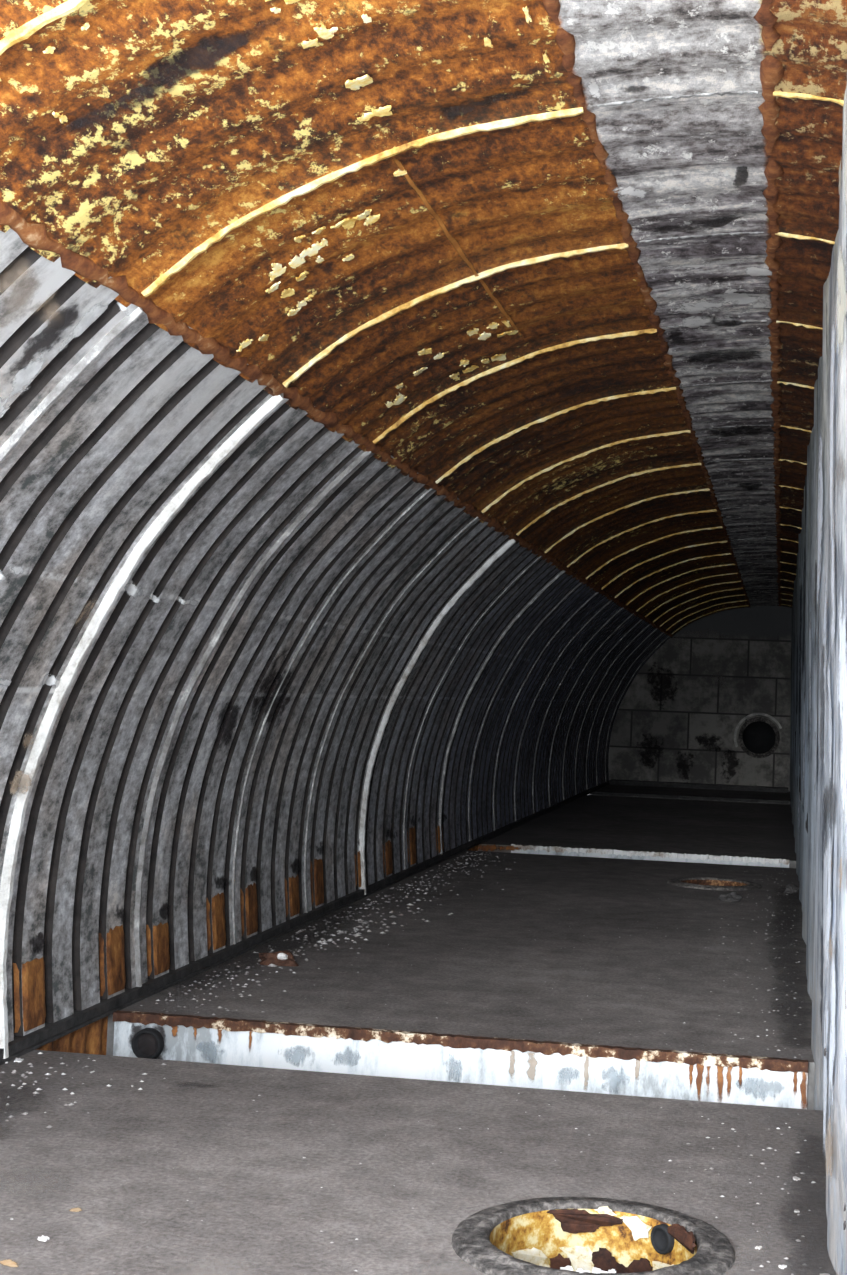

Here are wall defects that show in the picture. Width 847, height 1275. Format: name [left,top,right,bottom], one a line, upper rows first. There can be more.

peeling [265,0,300,14]
peeling [301,21,338,49]
peeling [345,74,373,90]
peeling [357,105,393,122]
peeling [265,209,380,316]
peeling [236,334,269,352]
corrosion [285,842,324,917]
corrosion [206,867,258,951]
corrosion [98,907,126,996]
corrosion [13,932,46,1033]
corrosion [689,1063,742,1100]
corrosion [793,1072,807,1109]